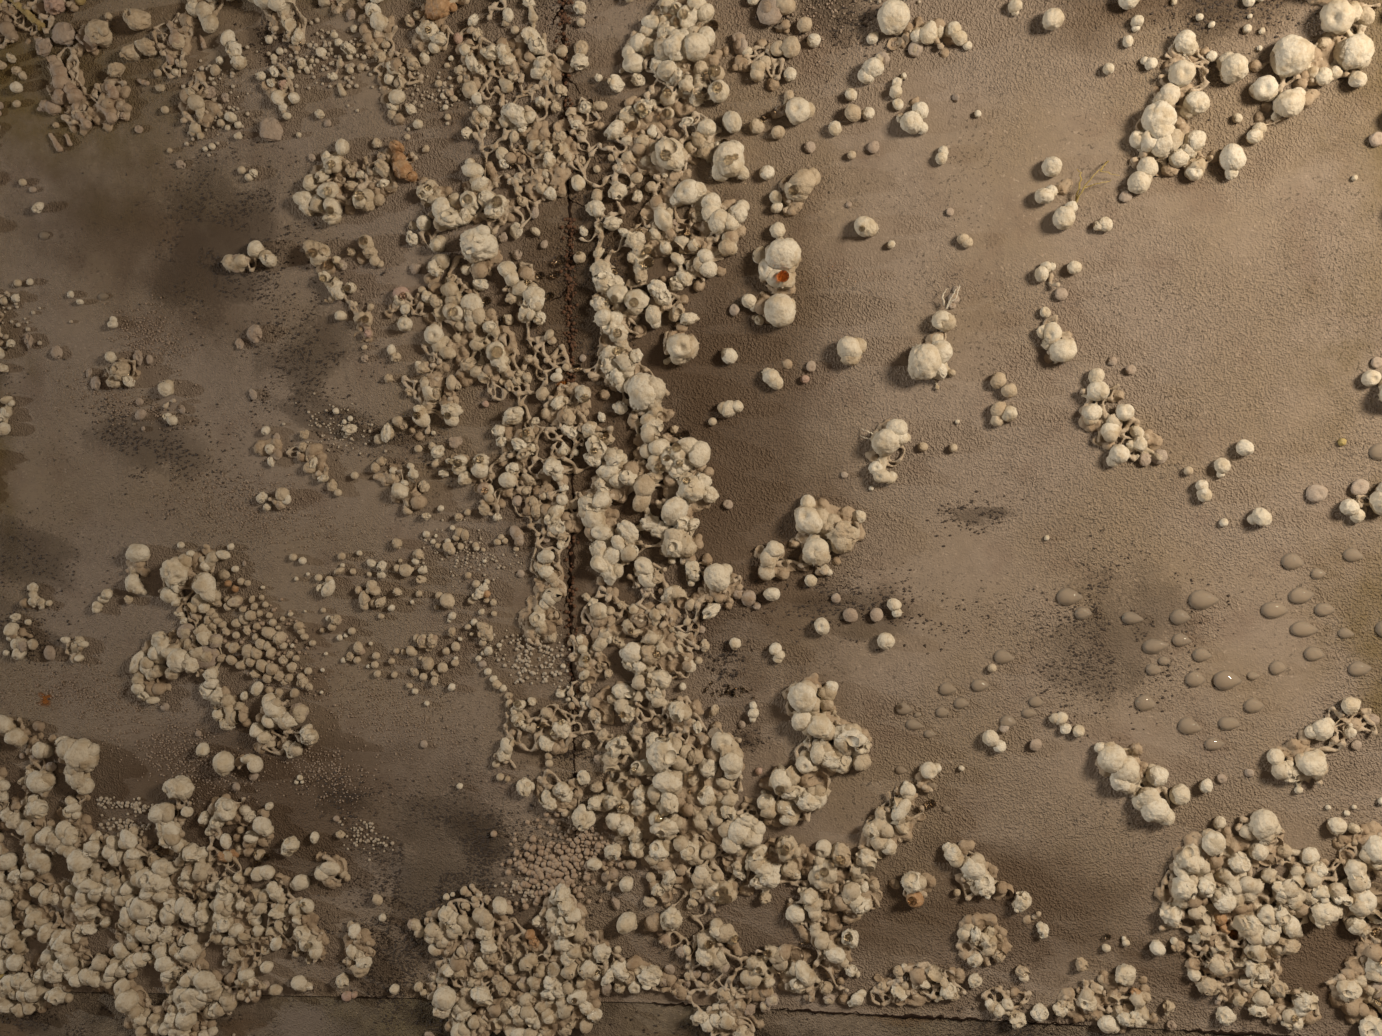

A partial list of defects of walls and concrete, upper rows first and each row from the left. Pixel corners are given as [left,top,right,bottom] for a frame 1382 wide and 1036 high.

leakage [1125,55,1227,194]
crack [549,0,585,789]
leakage [0,0,1056,1036]
leakage [1104,934,1130,947]
crack [650,1000,710,1008]
crack [778,1008,1086,1026]
leakage [1073,970,1158,1036]
crack [1182,1028,1309,1036]